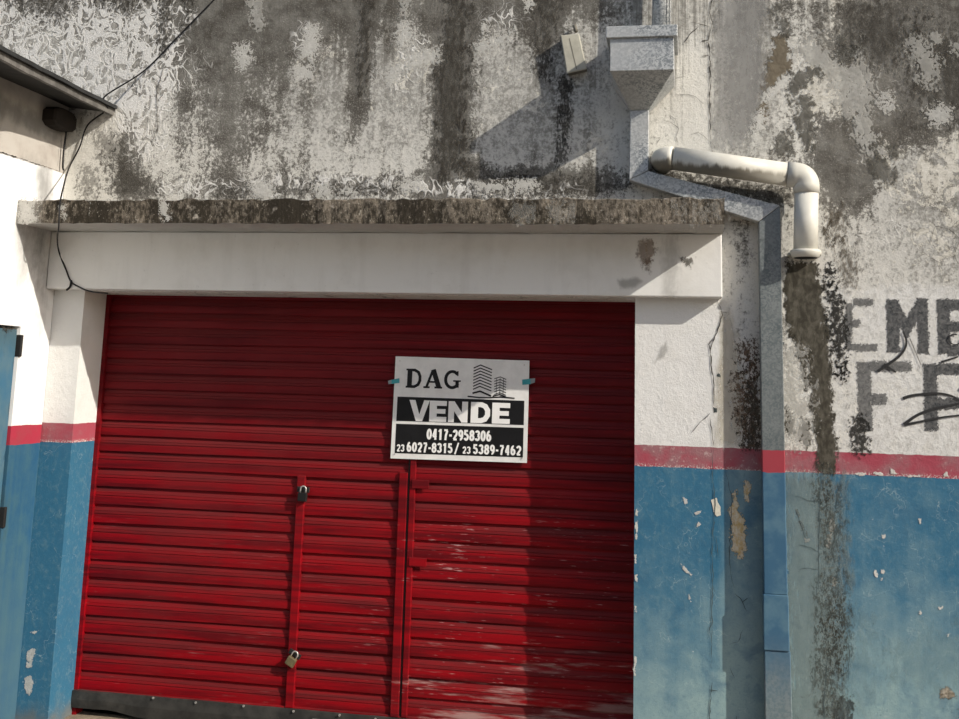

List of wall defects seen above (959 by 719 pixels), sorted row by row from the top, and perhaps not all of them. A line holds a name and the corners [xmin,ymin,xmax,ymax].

damp [0,0,81,26]
damp [93,0,194,57]
damp [354,0,376,97]
damp [431,0,633,200]
damp [210,178,401,200]
damp [739,377,761,452]
crack [691,305,748,657]
spalling [711,480,752,560]
crack [797,475,827,584]